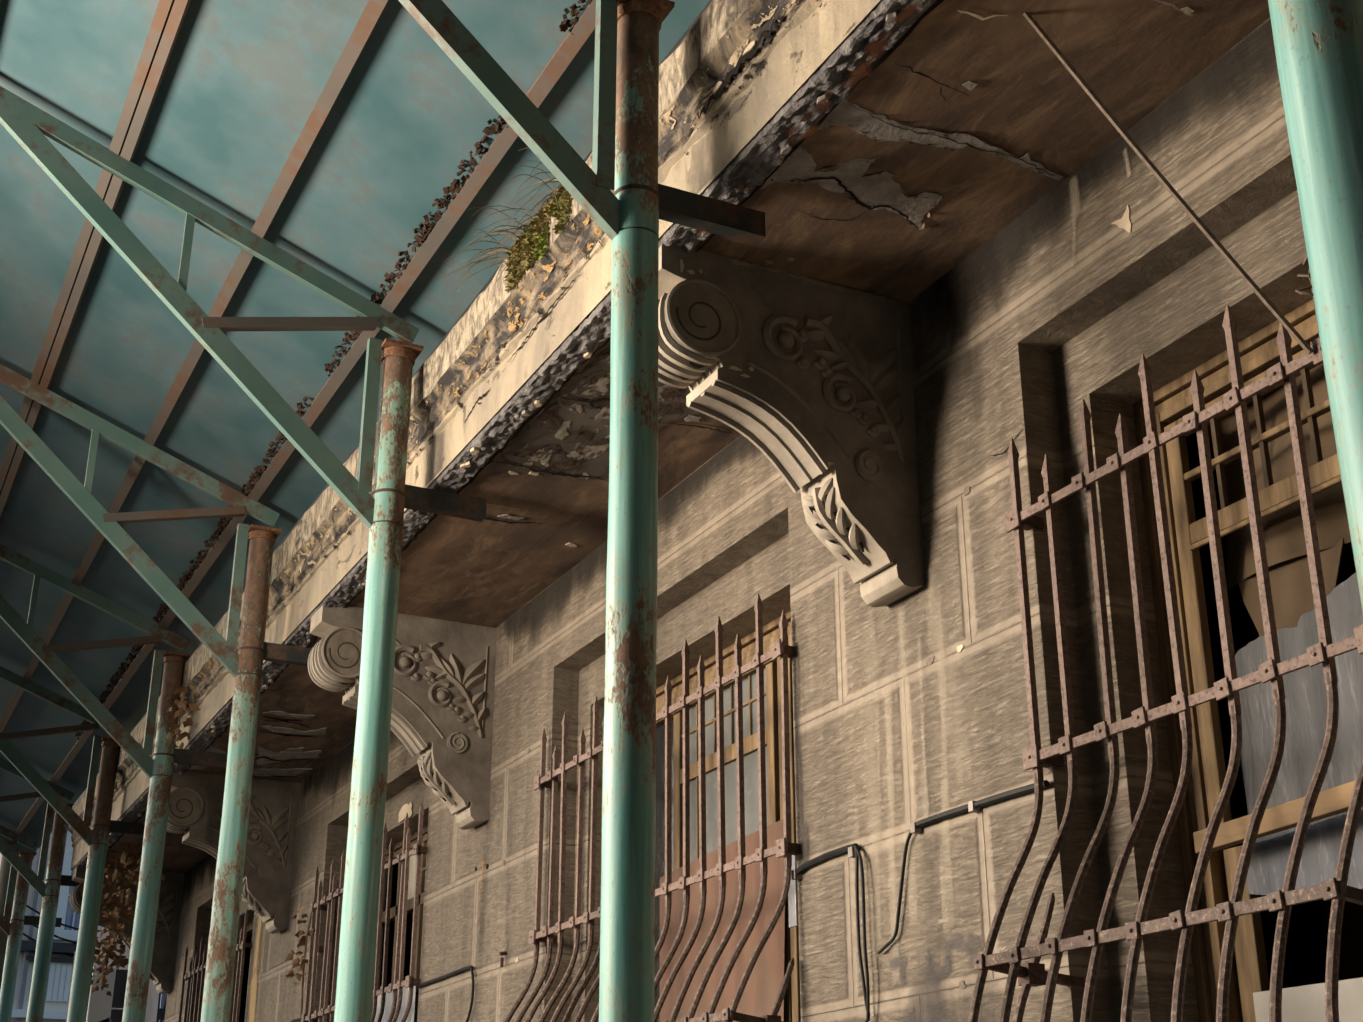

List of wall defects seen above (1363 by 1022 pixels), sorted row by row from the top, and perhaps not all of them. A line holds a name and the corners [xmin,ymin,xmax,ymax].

spalling [659,0,796,156]
spalling [700,0,1064,229]
spalling [659,223,715,274]
spalling [401,509,438,553]
spalling [268,502,368,648]
spalling [260,661,289,694]
spalling [173,696,233,775]
flaking render [253,711,327,777]